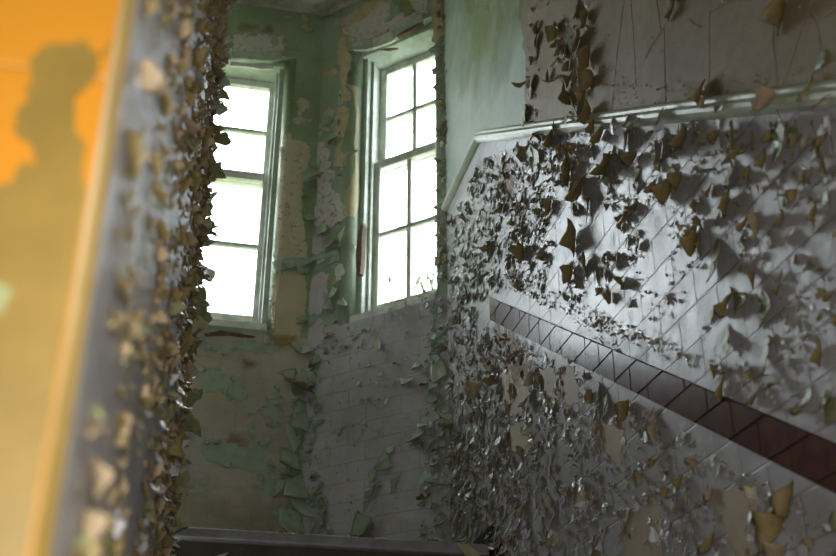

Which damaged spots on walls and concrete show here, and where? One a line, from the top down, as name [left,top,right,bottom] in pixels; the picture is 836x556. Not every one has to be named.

peeling [62,0,287,556]
flaking render [265,0,836,556]